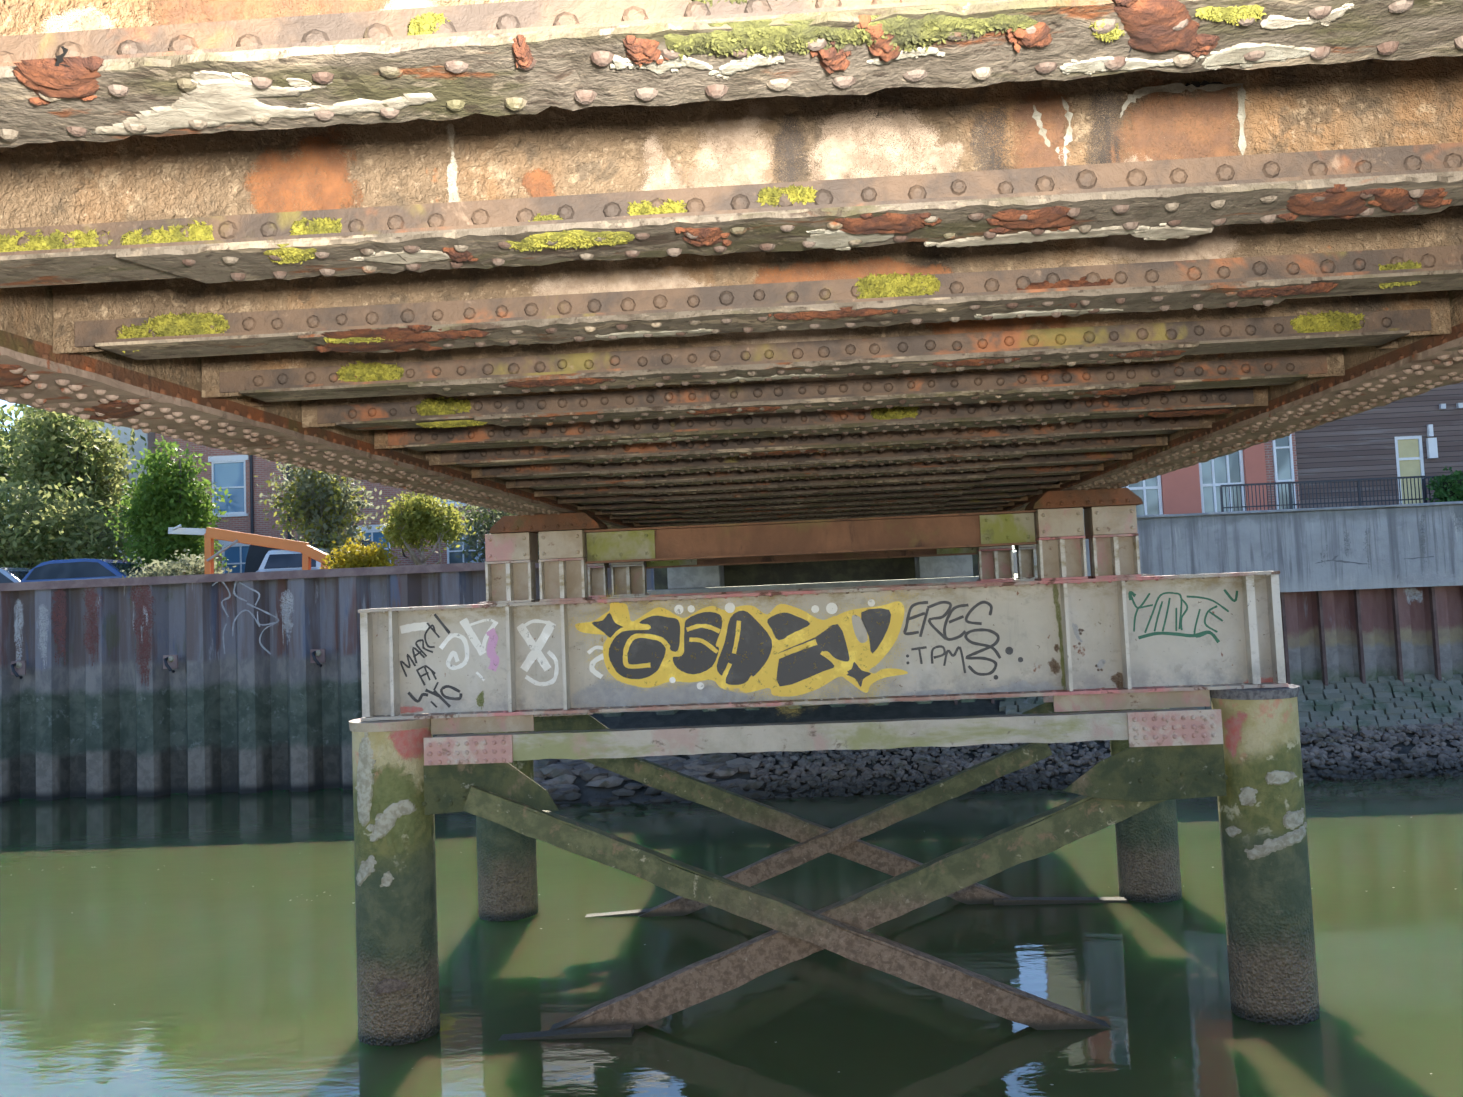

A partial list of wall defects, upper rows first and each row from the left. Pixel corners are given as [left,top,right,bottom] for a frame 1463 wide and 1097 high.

corrosion [13,56,104,106]
peeling [90,71,437,135]
peeling [610,53,785,80]
peeling [866,46,945,66]
peeling [1060,56,1176,75]
corrosion [1113,0,1220,58]
peeling [1195,3,1354,70]
corrosion [1276,184,1452,221]
corrosion [0,364,32,388]
corrosion [129,585,155,689]
peeling [355,732,416,887]
peeling [1225,808,1307,860]